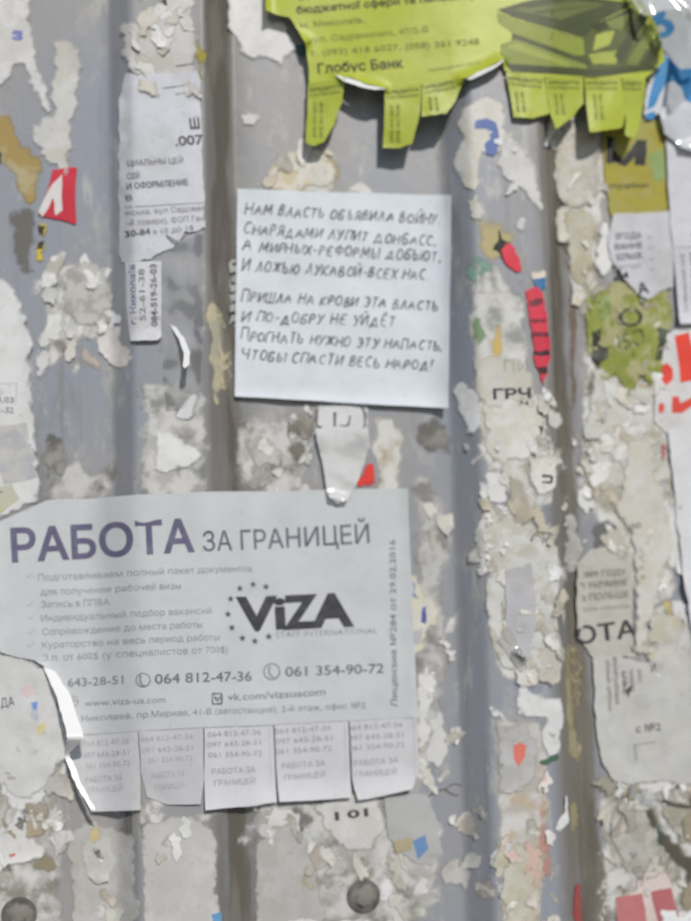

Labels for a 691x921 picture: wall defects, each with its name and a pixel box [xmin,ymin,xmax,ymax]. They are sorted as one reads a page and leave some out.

peeling [127,3,195,98]
peeling [35,251,133,372]
peeling [468,371,671,586]
peeling [0,762,124,921]
peeling [461,820,558,913]
peeling [537,771,553,793]